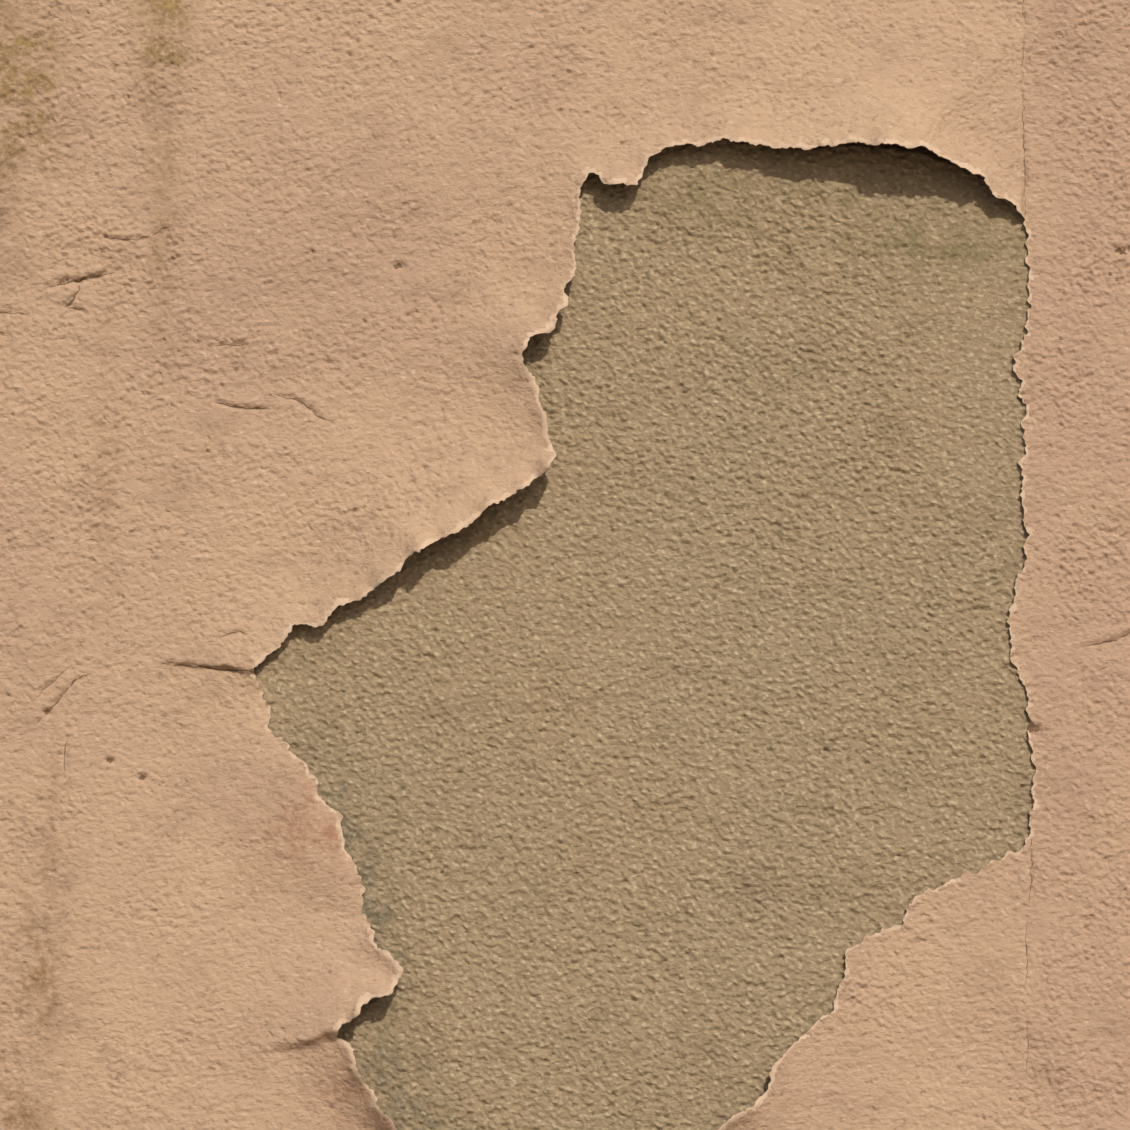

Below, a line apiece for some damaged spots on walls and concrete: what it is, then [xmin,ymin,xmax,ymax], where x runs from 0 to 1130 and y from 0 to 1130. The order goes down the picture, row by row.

peeling [128,59,1039,1130]